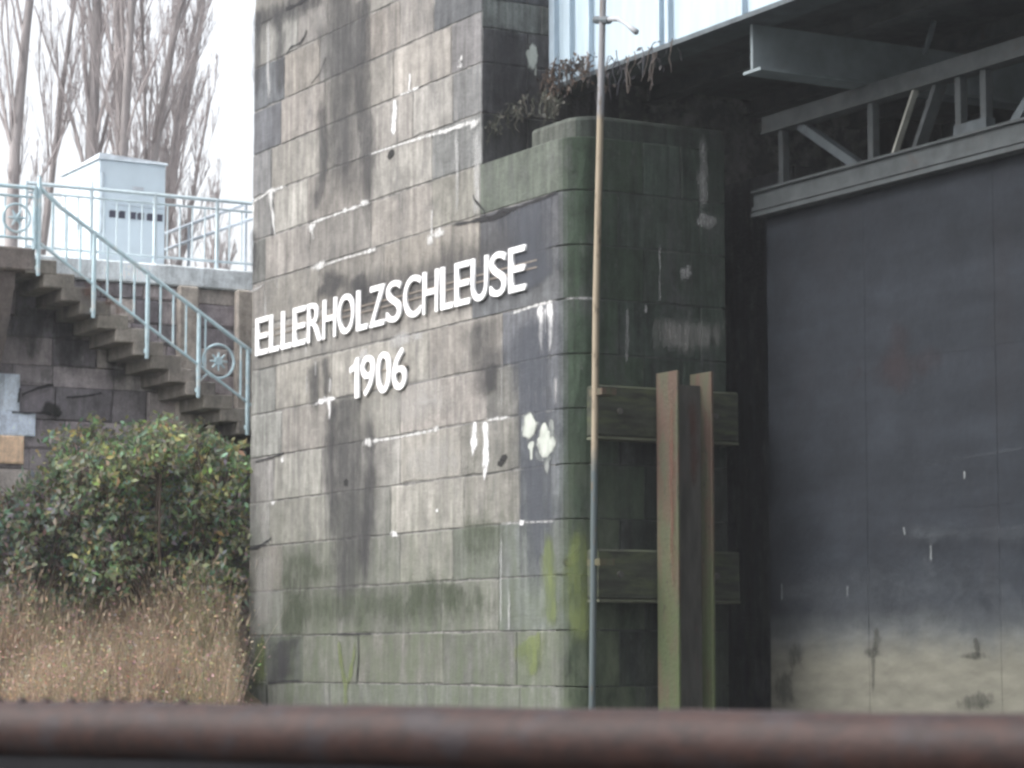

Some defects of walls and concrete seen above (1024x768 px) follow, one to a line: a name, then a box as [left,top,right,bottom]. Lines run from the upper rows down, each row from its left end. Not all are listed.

water stain [261,359,463,677]
water stain [511,300,556,620]